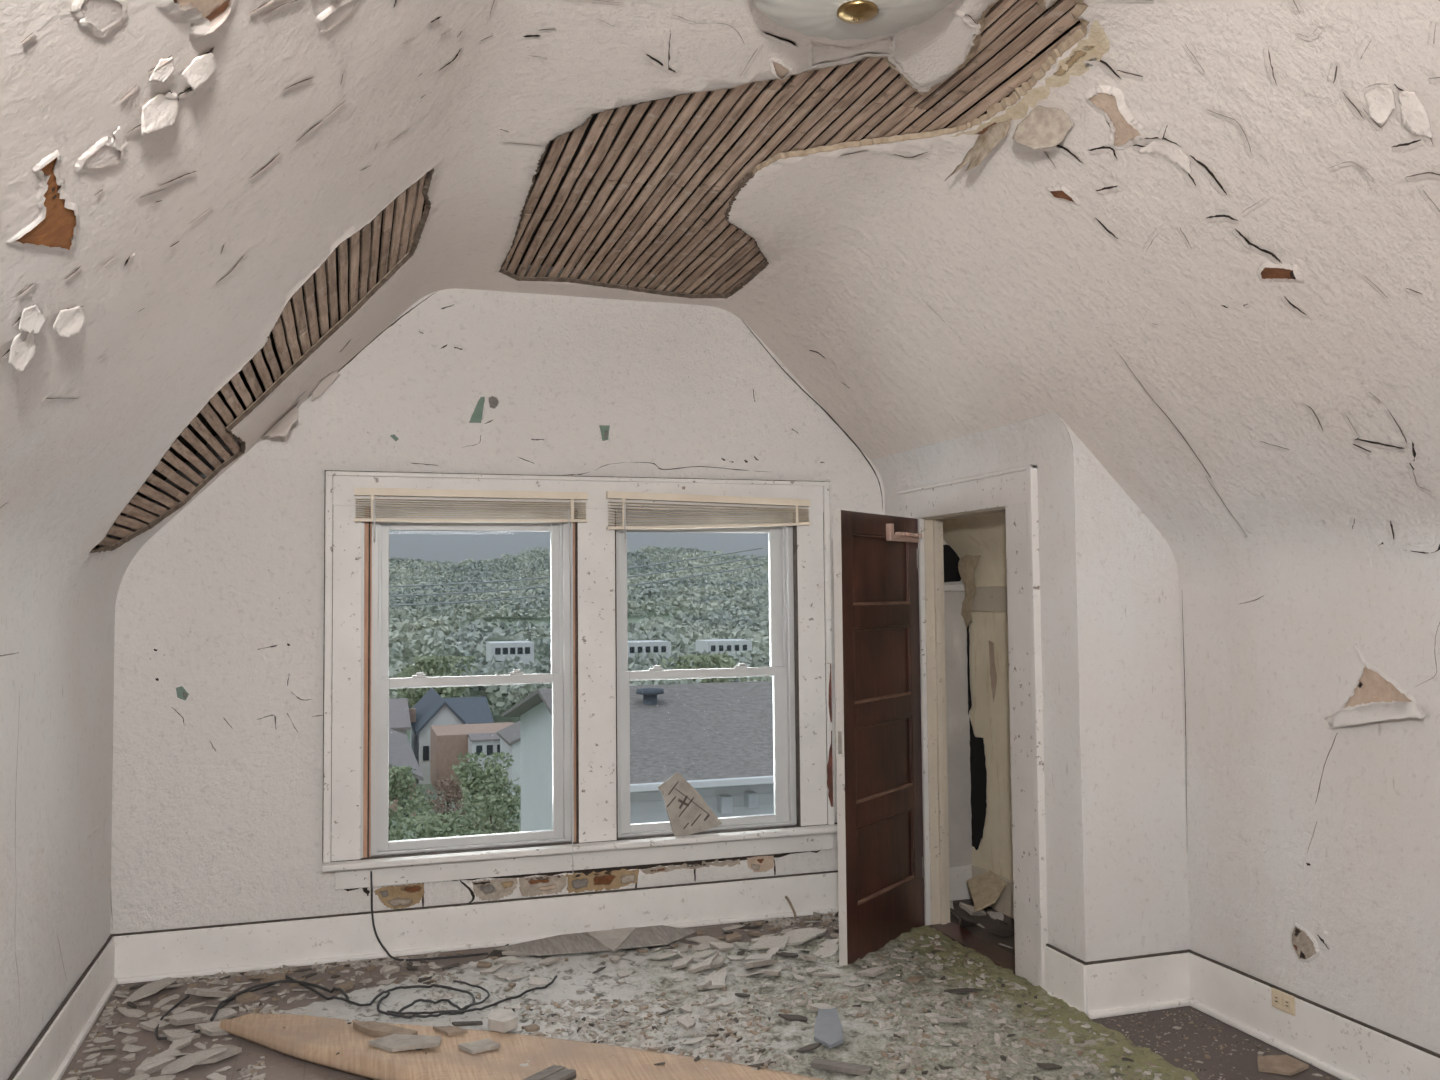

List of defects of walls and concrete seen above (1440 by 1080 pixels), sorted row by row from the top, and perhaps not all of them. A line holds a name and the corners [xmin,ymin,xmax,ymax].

peeling [156,0,237,40]
peeling [6,136,124,253]
crack [112,48,217,154]
crack [250,70,347,180]
crack [359,0,624,174]
flaking render [499,0,1192,299]
flaking render [90,168,435,553]
crack [298,293,463,399]
crack [1114,349,1248,537]
peeling [1325,644,1425,728]
crack [1306,733,1338,866]
spalling [374,883,425,909]